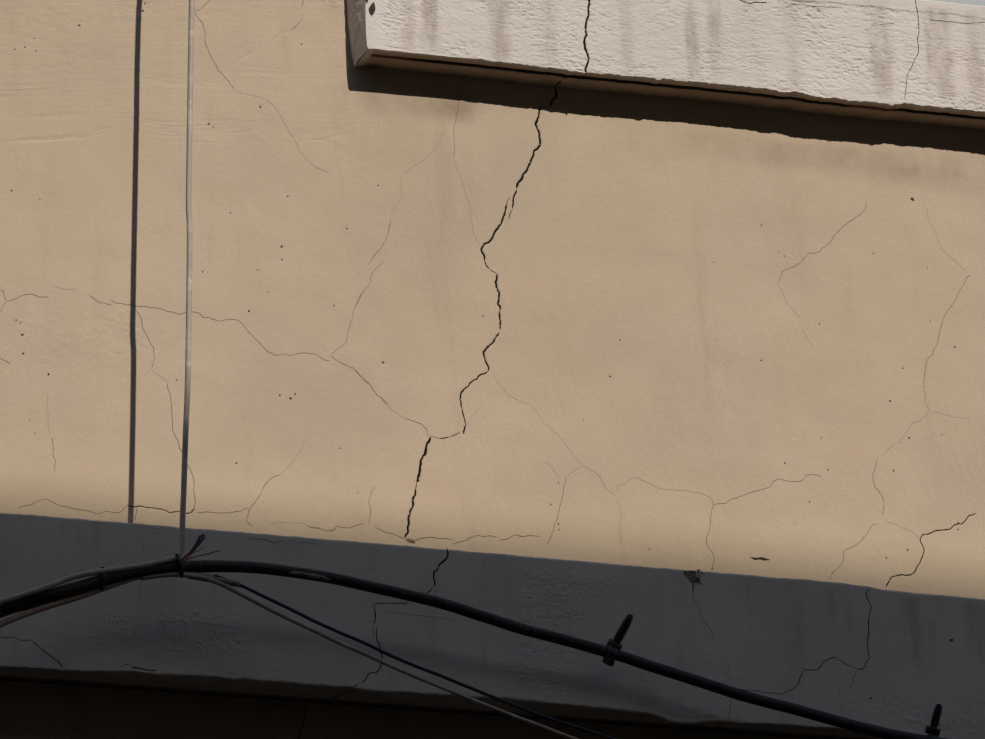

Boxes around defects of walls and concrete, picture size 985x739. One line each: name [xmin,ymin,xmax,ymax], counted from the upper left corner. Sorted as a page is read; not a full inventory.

crack [905,0,919,95]
crack [19,0,821,595]
crack [692,204,976,727]
crack [1,627,63,667]
crack [299,593,450,739]
spalling [684,568,713,584]